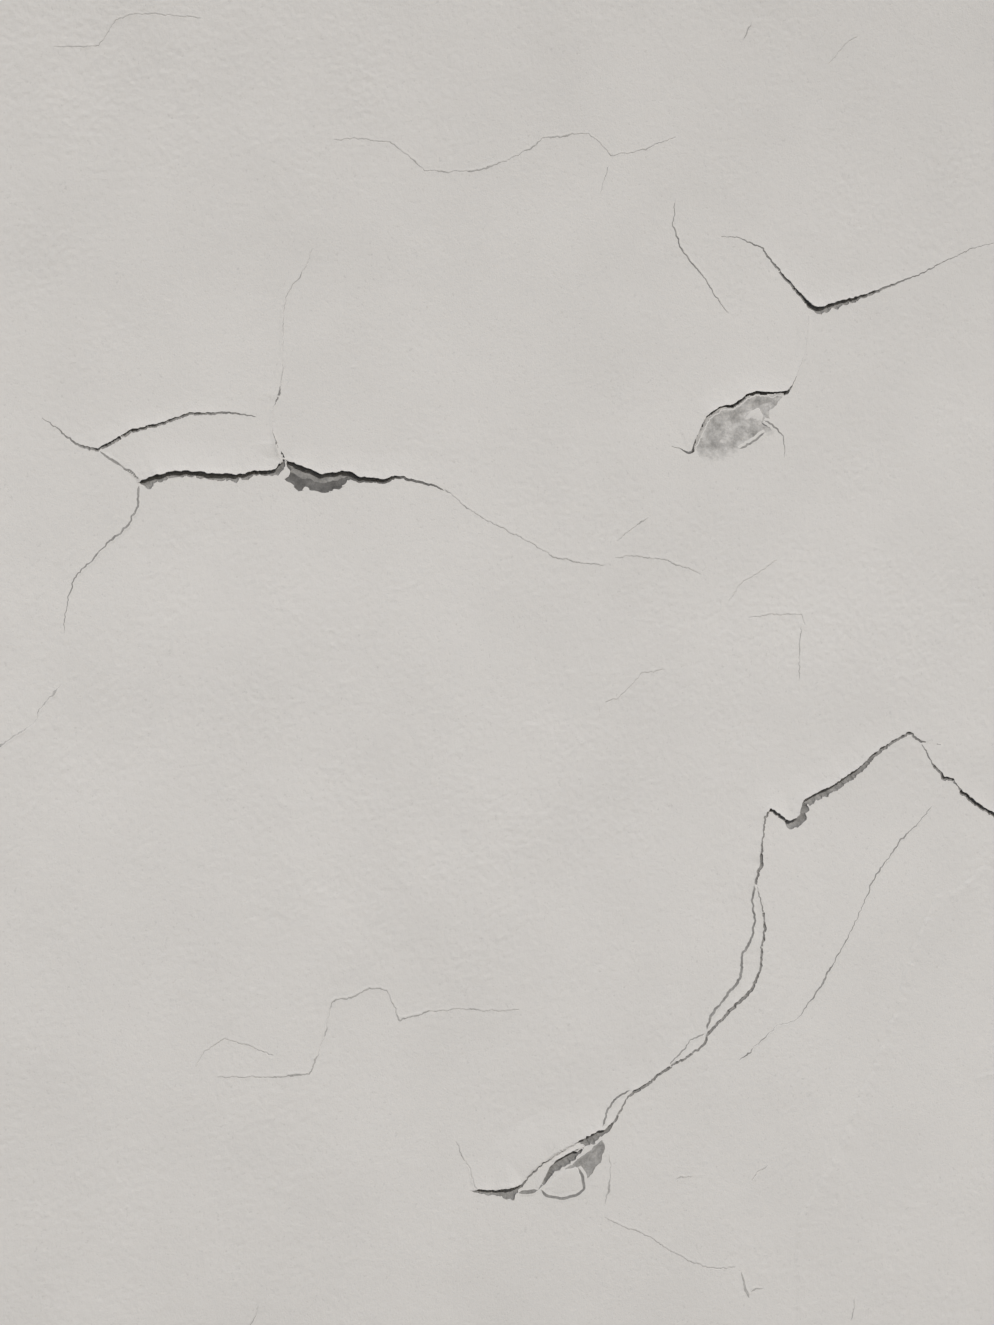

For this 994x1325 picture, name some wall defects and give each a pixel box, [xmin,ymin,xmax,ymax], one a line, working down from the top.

crack [334,131,676,195]
crack [670,200,729,314]
crack [721,223,993,315]
crack [42,247,700,633]
spalling [672,313,816,462]
crack [728,559,806,681]
crack [195,985,519,1080]
crack [454,705,994,1299]
spalling [536,1140,605,1202]